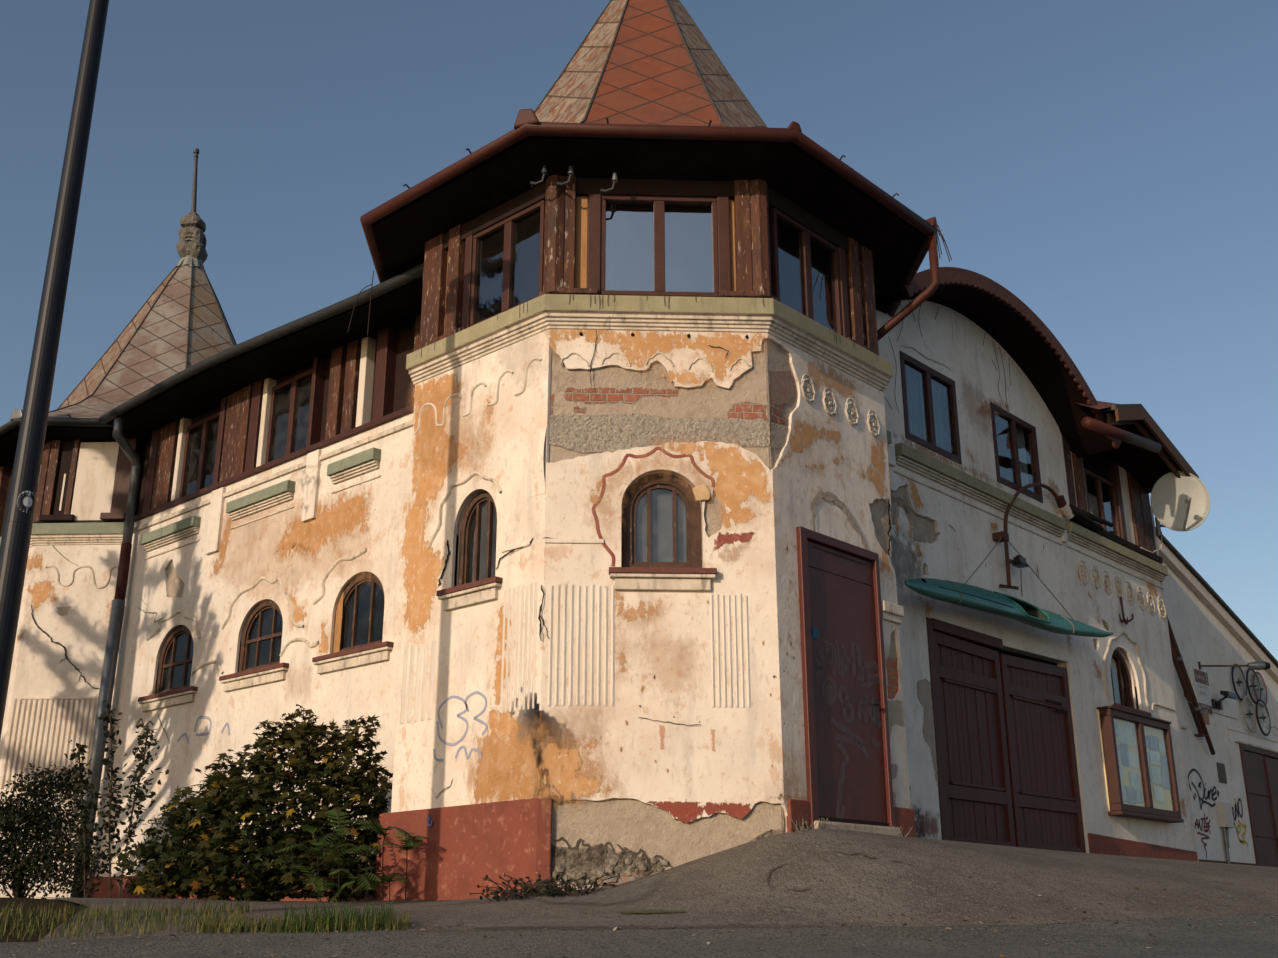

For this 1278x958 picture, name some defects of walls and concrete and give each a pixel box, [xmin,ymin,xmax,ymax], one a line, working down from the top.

peeling [274,493,376,573]
peeling [399,374,467,635]
spalling [549,329,855,549]
spalling [862,438,938,575]
crack [31,605,100,689]
spalling [473,603,806,890]
peeling [917,679,938,782]